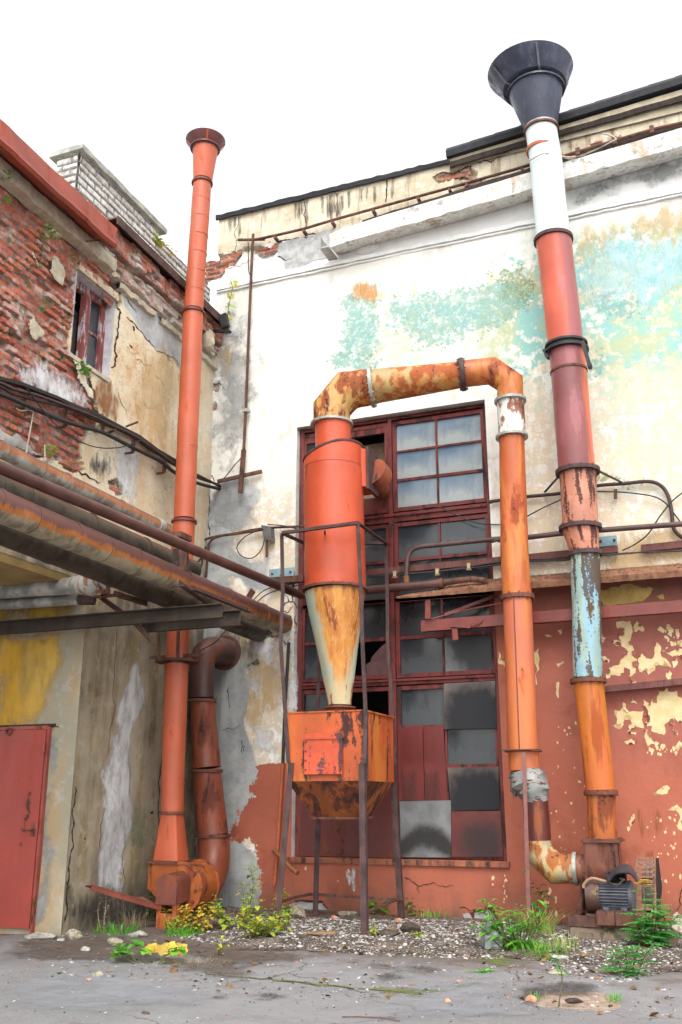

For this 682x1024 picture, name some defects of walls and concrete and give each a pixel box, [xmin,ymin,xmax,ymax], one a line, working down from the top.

leakage [322,189,376,218]
flaking render [0,185,119,473]
crack [88,292,179,416]
flaking render [205,251,244,286]
peeling [602,621,682,756]
leakage [66,663,155,925]
crack [404,877,482,911]